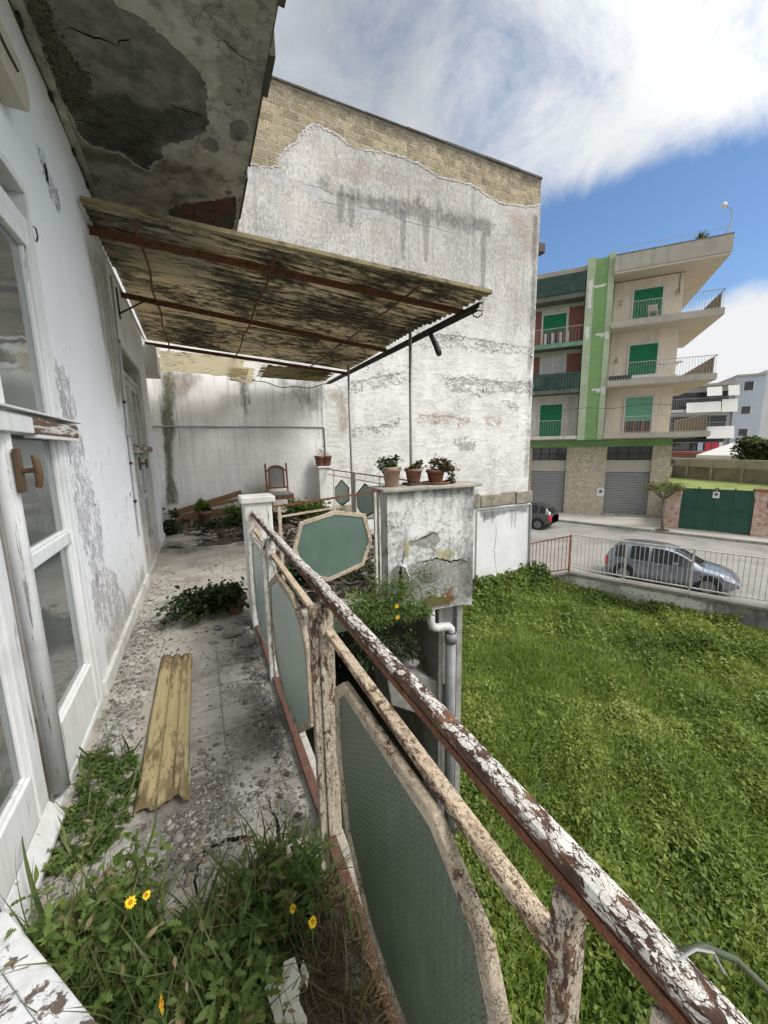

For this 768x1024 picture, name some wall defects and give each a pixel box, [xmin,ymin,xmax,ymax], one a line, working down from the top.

crack [64,27,132,47]
spalling [22,0,541,212]
spalling [163,192,241,231]
damp [247,170,417,227]
damp [163,373,190,503]
peeling [54,359,126,635]
spalling [389,531,524,608]
crack [191,799,287,900]